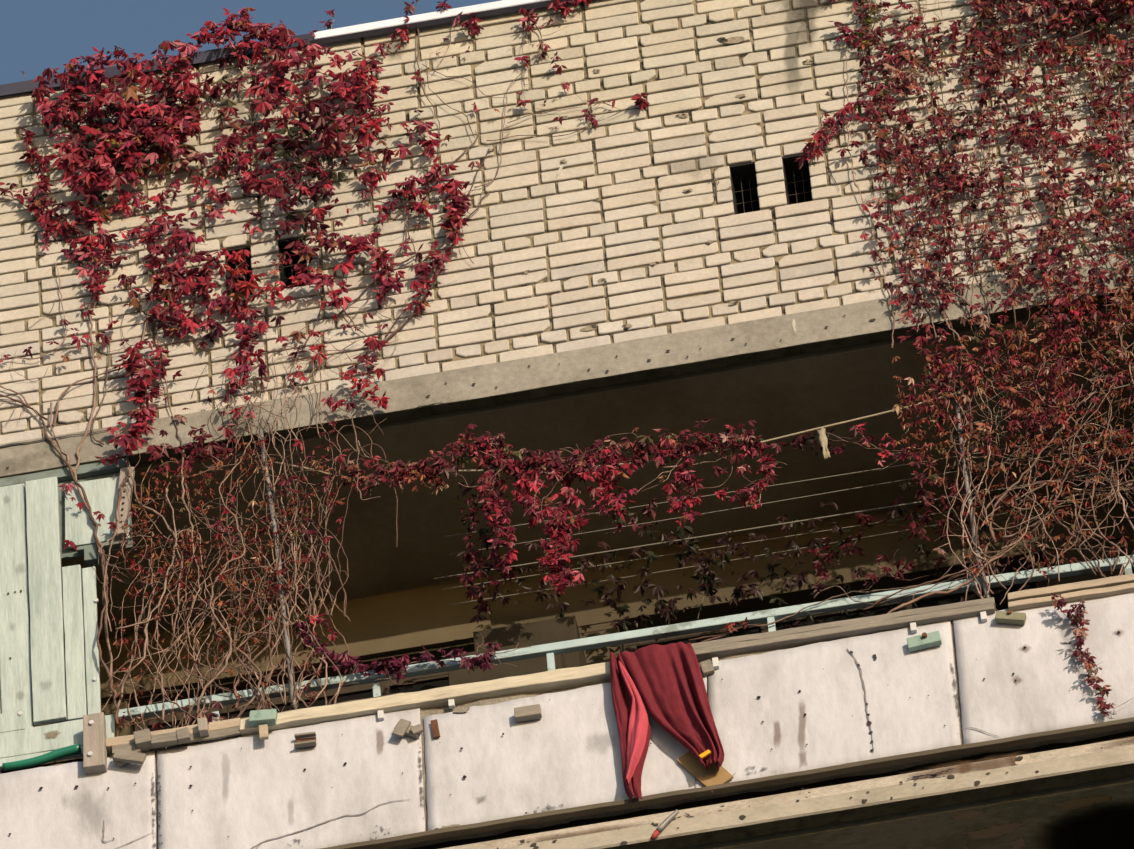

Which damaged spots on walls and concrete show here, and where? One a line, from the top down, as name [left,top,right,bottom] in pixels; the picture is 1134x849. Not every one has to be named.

crack [847,648,877,753]
crack [250,799,408,849]